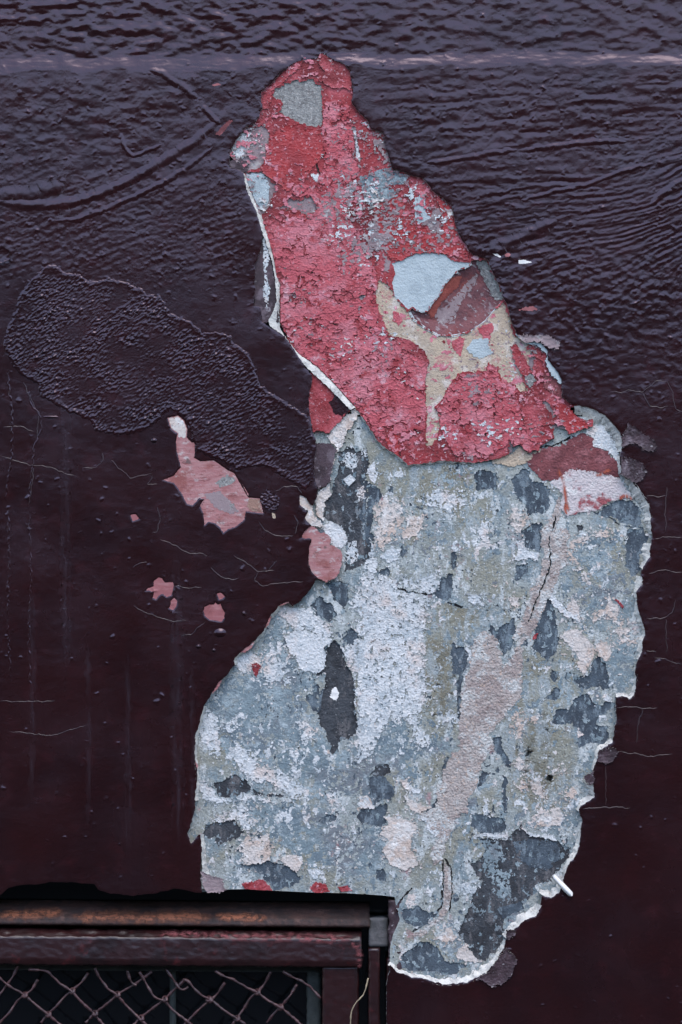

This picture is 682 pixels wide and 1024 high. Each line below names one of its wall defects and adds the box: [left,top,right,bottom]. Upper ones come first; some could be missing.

crack [7,384,40,436]
peeling [164,416,276,533]
crack [5,454,303,589]
spalling [188,53,657,987]
crack [649,493,682,539]
peeling [147,577,177,610]
crack [136,607,205,637]
crack [528,516,556,621]
crack [647,600,680,664]
crack [9,725,86,736]
crack [584,706,670,809]